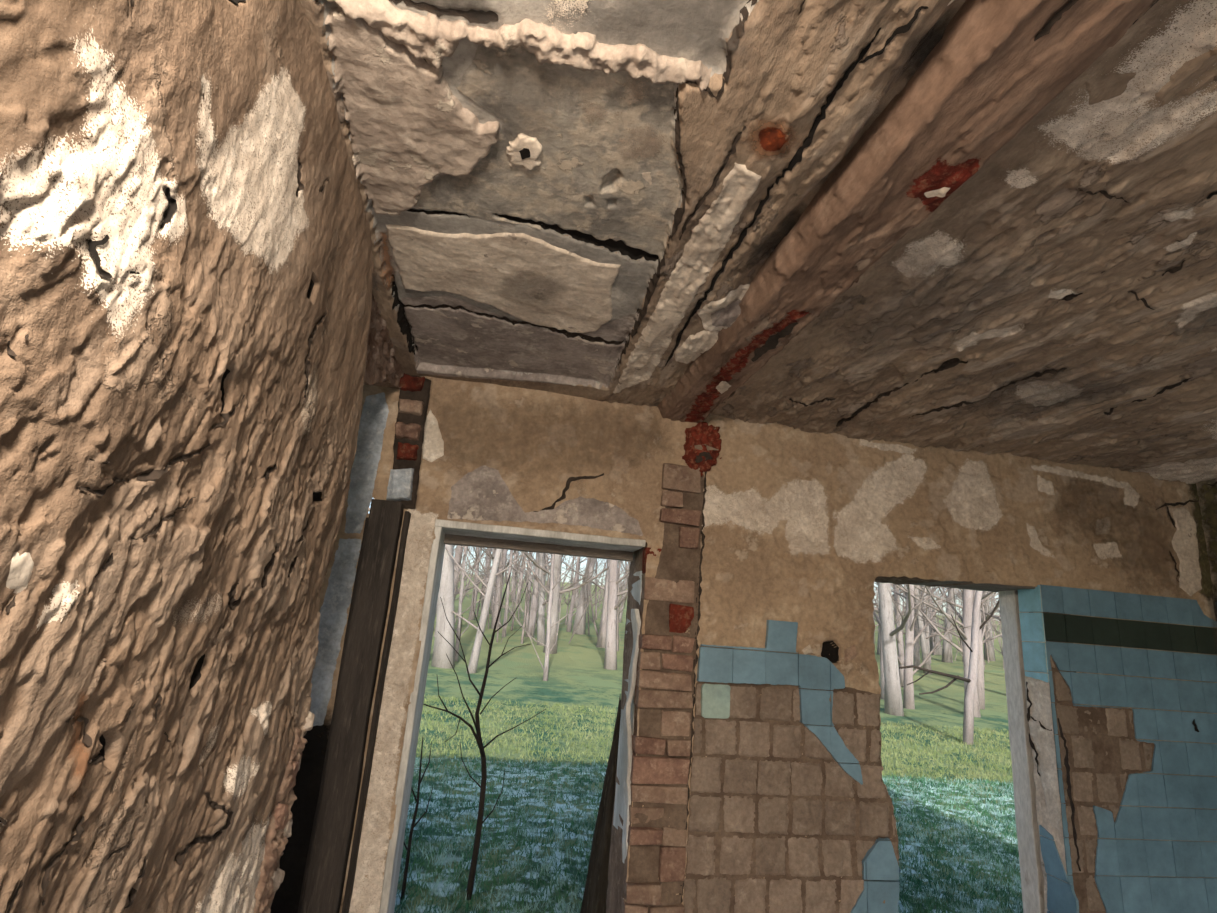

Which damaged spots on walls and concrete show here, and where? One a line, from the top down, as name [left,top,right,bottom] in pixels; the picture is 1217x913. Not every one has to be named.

spalling [1025,655,1155,913]